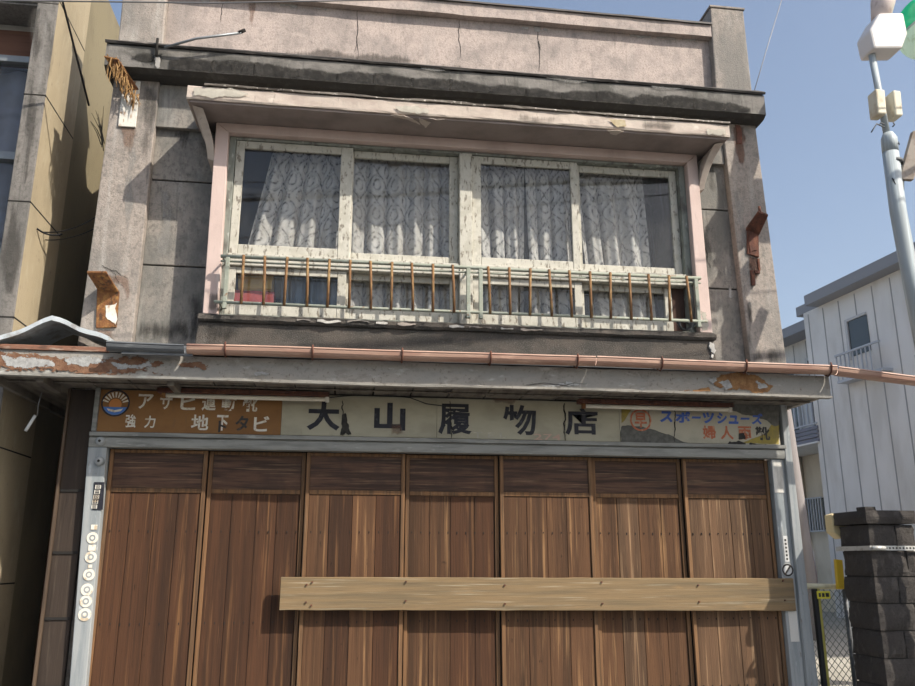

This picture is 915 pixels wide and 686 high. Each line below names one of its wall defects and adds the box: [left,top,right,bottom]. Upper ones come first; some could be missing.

leakage [132,53,750,112]
peeling [0,351,164,376]
peeling [179,361,208,370]